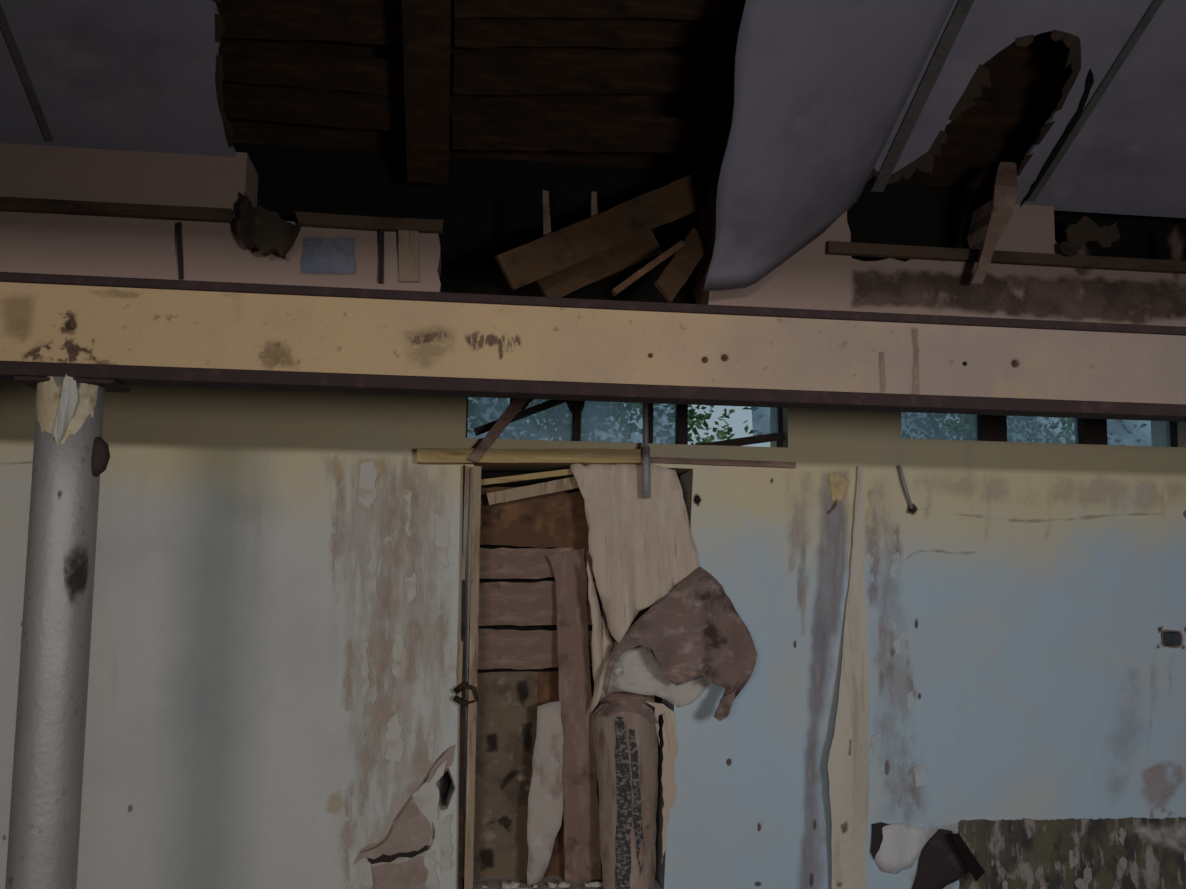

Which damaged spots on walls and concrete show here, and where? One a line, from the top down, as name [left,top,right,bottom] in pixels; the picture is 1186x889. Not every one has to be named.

peeling [213,0,236,147]
peeling [867,64,991,186]
peeling [1015,30,1081,176]
corrosion [25,312,107,364]
peeling [35,375,98,445]
water stain [791,490,844,712]
flaking render [353,745,456,889]
peeling [912,817,1186,889]